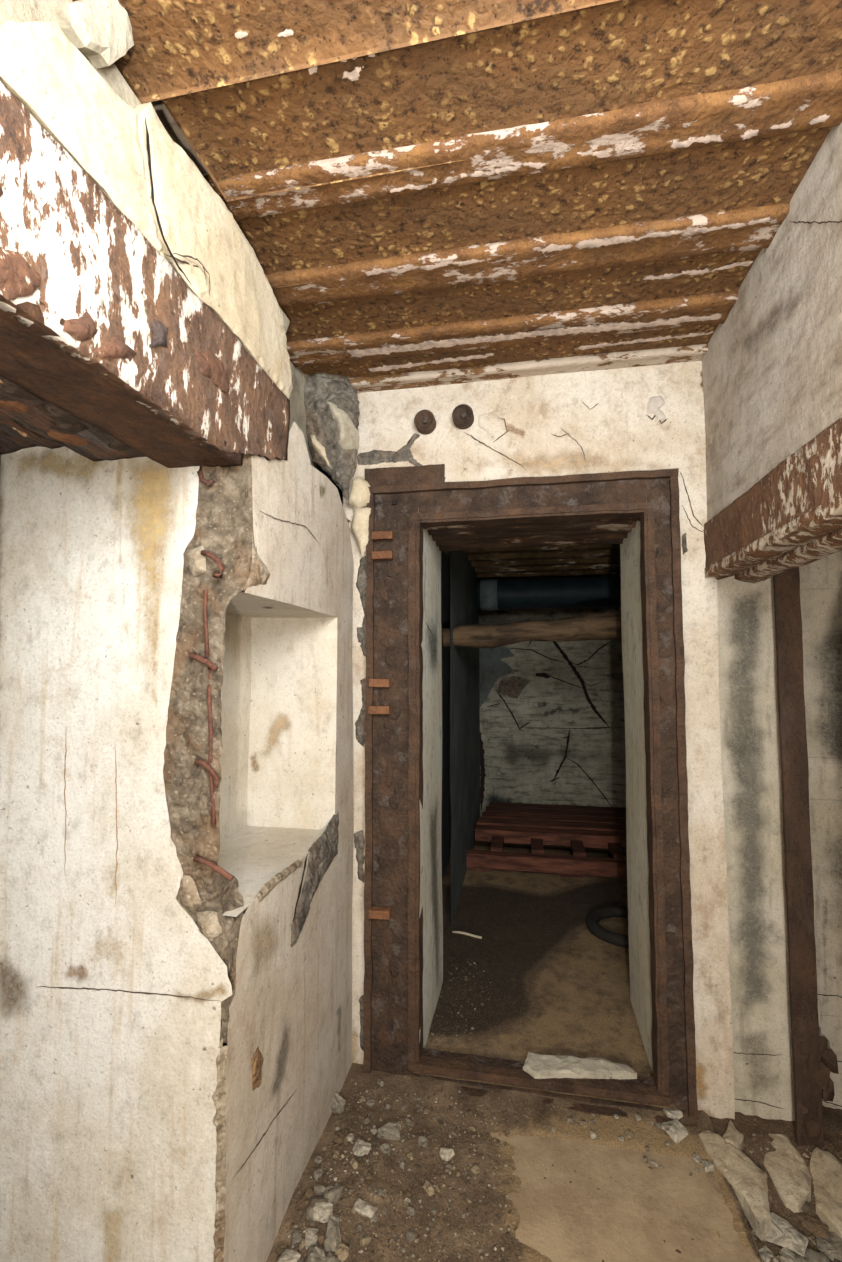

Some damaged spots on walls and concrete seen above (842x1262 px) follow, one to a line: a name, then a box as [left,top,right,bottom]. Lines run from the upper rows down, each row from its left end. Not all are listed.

peeling [460,162,548,178]
peeling [667,134,724,149]
peeling [740,114,830,140]
flaking render [0,0,423,503]
peeling [533,217,777,254]
peeling [643,261,753,280]
crack [789,218,842,226]
peeling [346,313,722,372]
spalling [356,556,367,657]
crack [480,641,613,811]
leakage [731,598,764,1006]
spalling [163,455,339,1262]